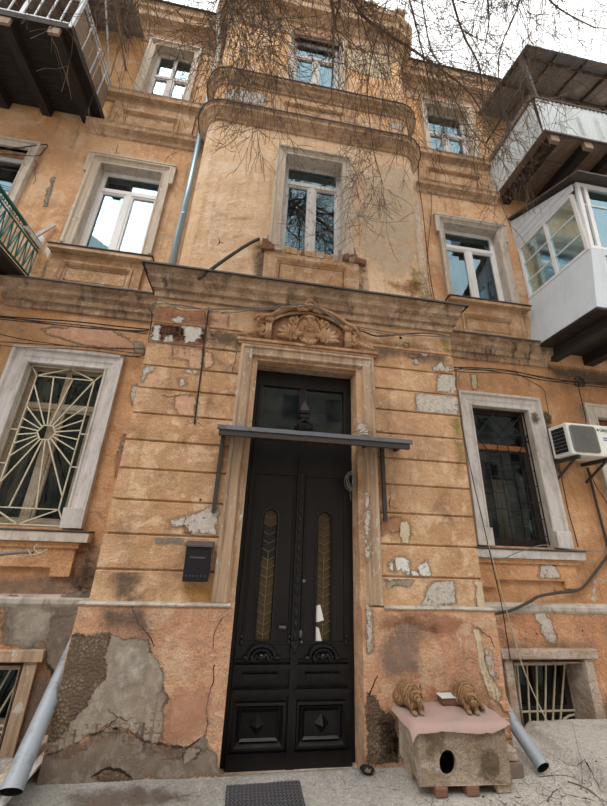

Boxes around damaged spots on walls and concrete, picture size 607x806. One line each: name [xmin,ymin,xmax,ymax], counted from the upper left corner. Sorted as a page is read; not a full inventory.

peeling [41,305,229,416]
peeling [414,362,459,415]
peeling [169,505,219,535]
peeling [538,564,561,580]
peeling [421,579,457,606]
peeling [534,613,558,646]
flaking render [0,590,169,755]
crack [89,617,223,757]
flaking render [364,695,399,767]
crack [91,767,131,778]
flaking render [97,770,132,782]